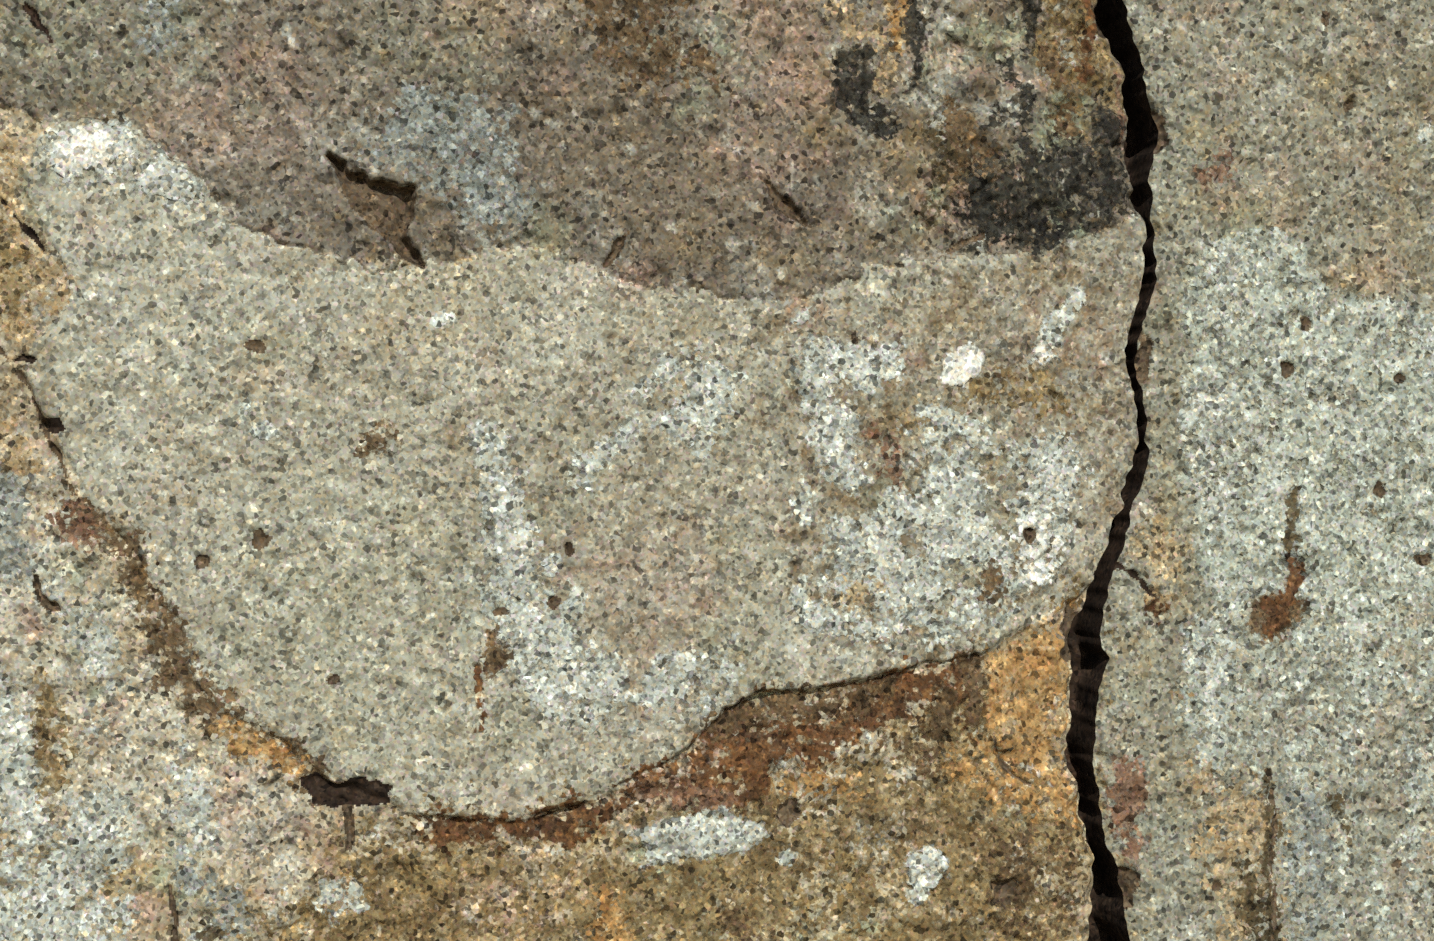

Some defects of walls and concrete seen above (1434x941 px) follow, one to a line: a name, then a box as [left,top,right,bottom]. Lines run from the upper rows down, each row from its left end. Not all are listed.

leakage [914,0,1133,256]
crack [1060,0,1170,941]
rust [1245,485,1314,645]